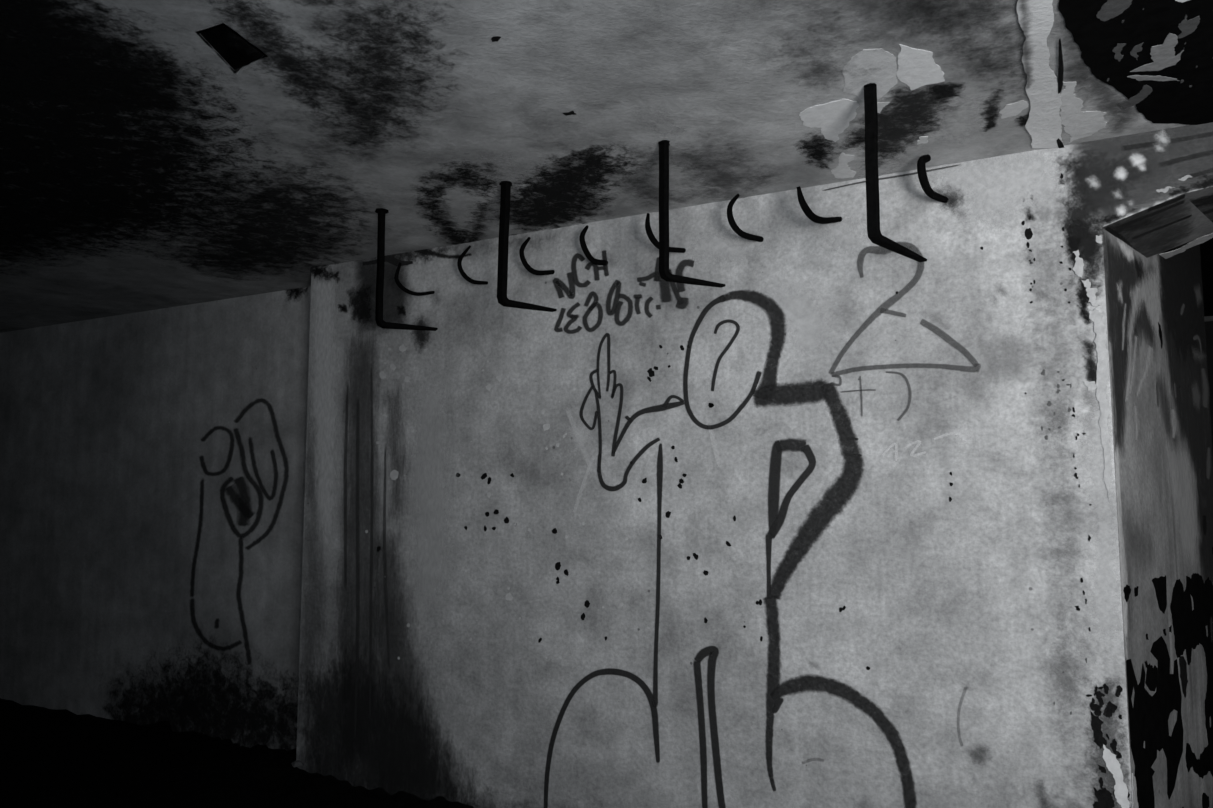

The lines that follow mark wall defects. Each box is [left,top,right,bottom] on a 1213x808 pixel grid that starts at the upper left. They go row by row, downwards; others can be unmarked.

peeling [999,100,1029,119]
peeling [1058,0,1213,143]
peeling [1041,234,1213,808]